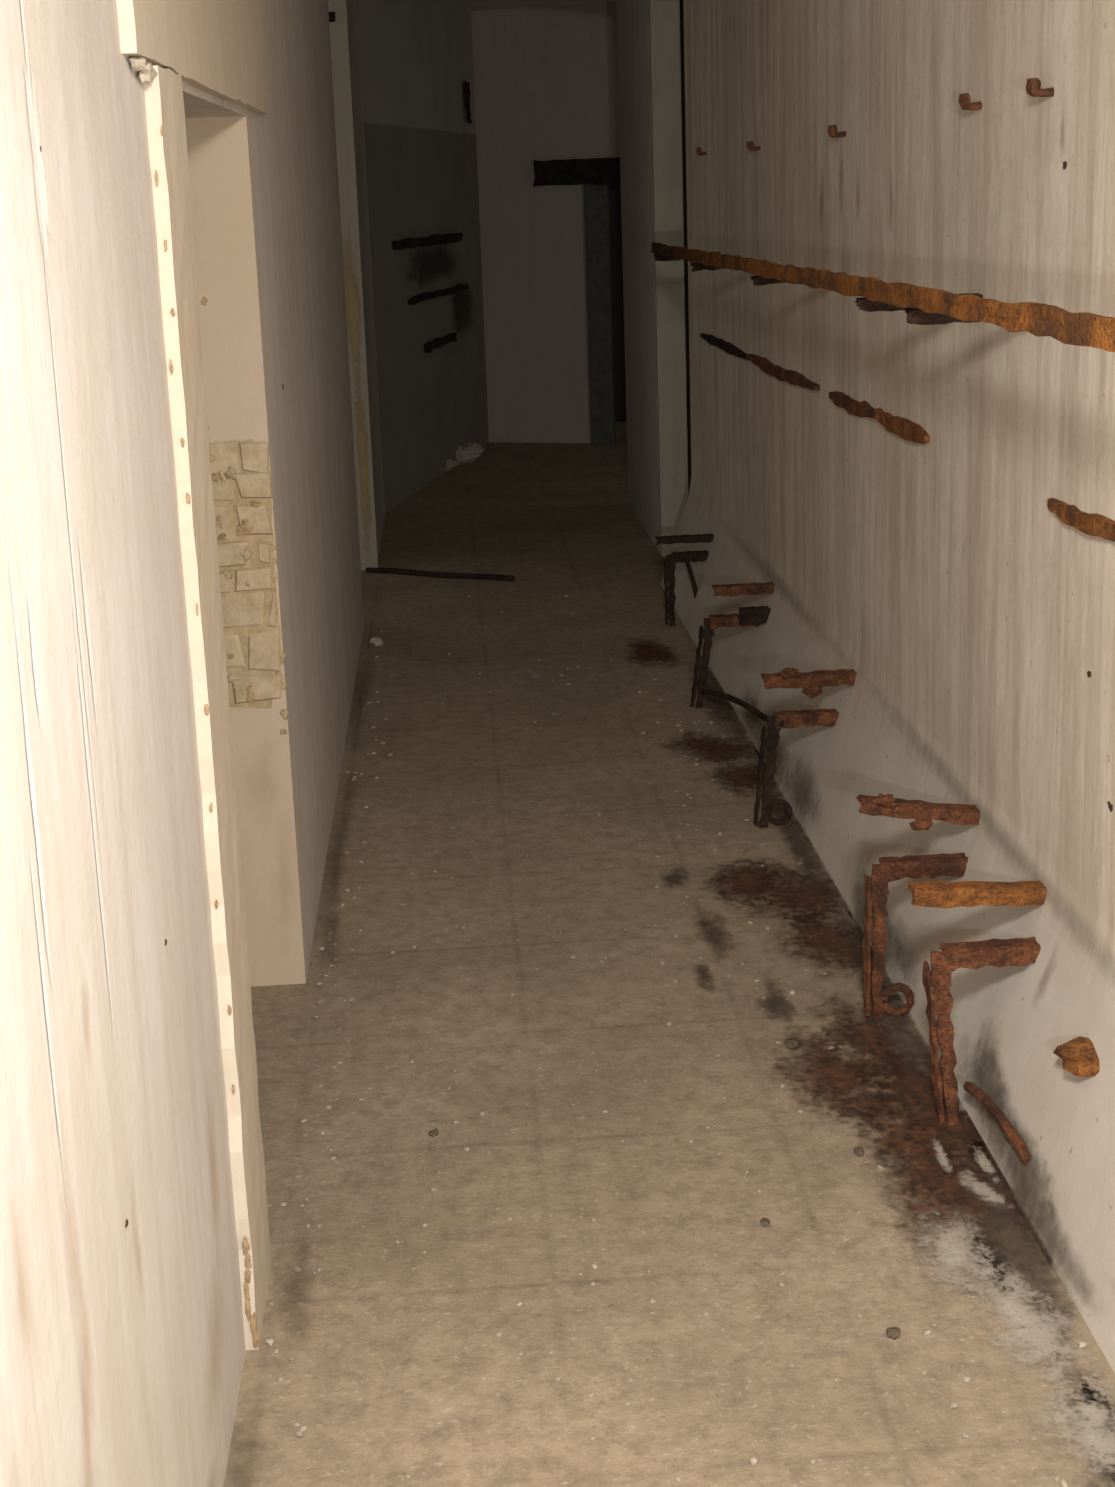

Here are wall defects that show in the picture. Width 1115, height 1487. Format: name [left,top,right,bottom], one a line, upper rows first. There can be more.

corrosion [709,861,873,968]
corrosion [776,998,1051,1258]